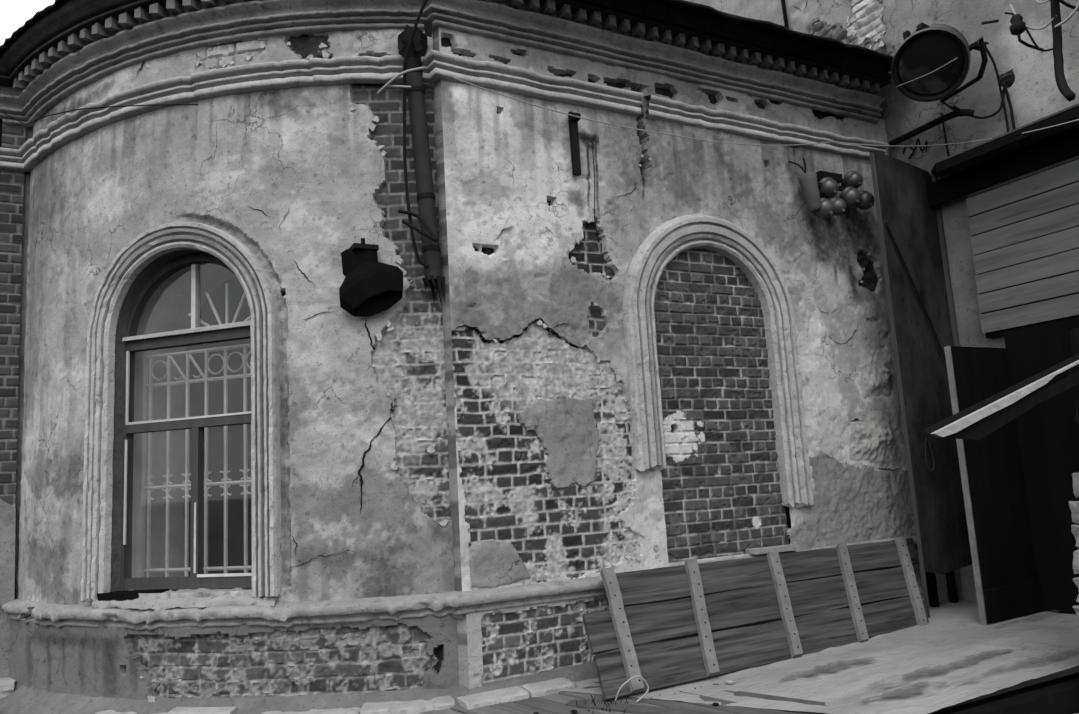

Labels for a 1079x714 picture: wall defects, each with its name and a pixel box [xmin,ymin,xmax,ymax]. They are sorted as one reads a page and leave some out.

flaking render [287,35,332,59]
spalling [441,38,464,56]
flaking render [809,0,895,56]
spalling [588,79,629,89]
spalling [655,87,673,99]
flaking render [857,251,884,292]
flaking render [350,83,660,583]
crack [352,400,393,512]
flaking render [130,625,443,702]
flaking render [481,599,610,684]